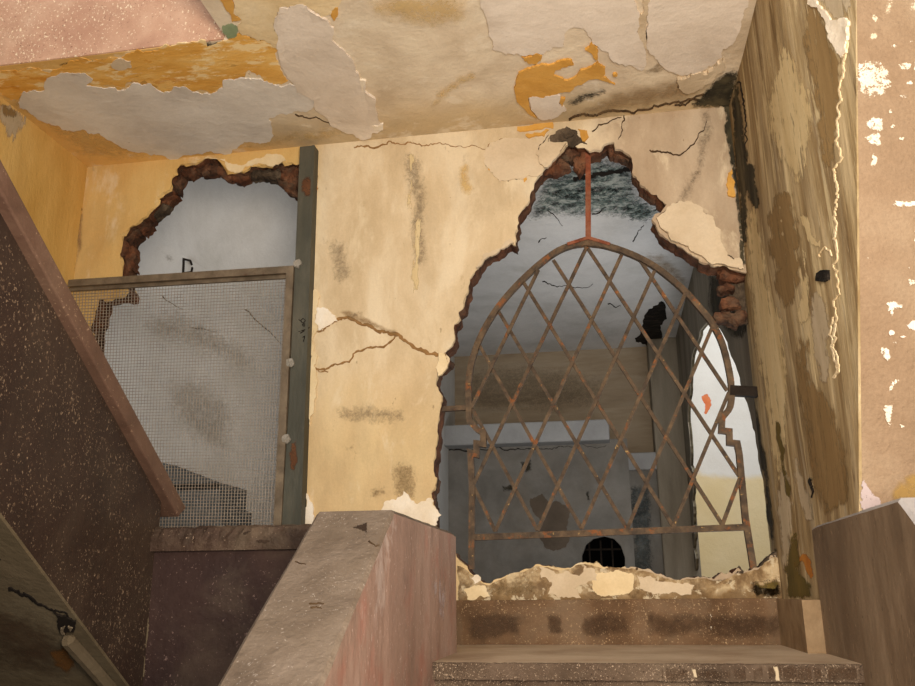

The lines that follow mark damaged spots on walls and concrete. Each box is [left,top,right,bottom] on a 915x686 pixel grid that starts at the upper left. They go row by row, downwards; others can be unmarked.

crack [569,93,704,138]
peeling [0,0,383,275]
crack [354,141,485,150]
crack [649,121,707,156]
peeling [865,133,881,166]
crack [573,167,631,182]
flaking render [457,0,851,600]
crack [315,316,446,373]
crack [8,587,69,618]
damp [650,616,777,635]
crack [142,620,150,677]